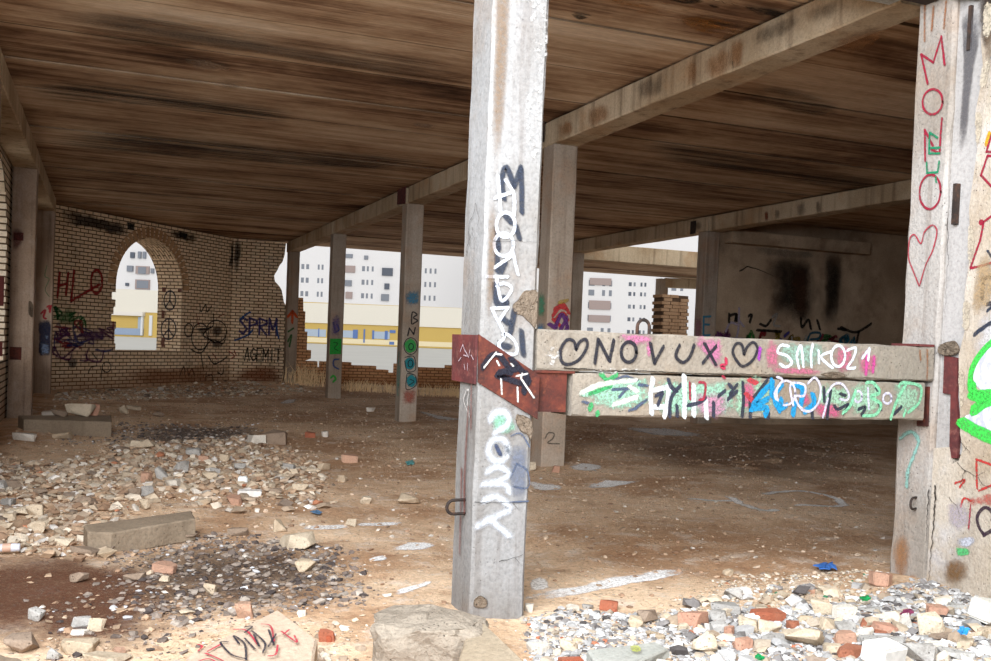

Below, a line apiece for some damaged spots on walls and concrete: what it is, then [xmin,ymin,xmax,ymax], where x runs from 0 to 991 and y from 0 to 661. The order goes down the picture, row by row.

water stain [980,0,991,50]
water stain [826,260,840,315]